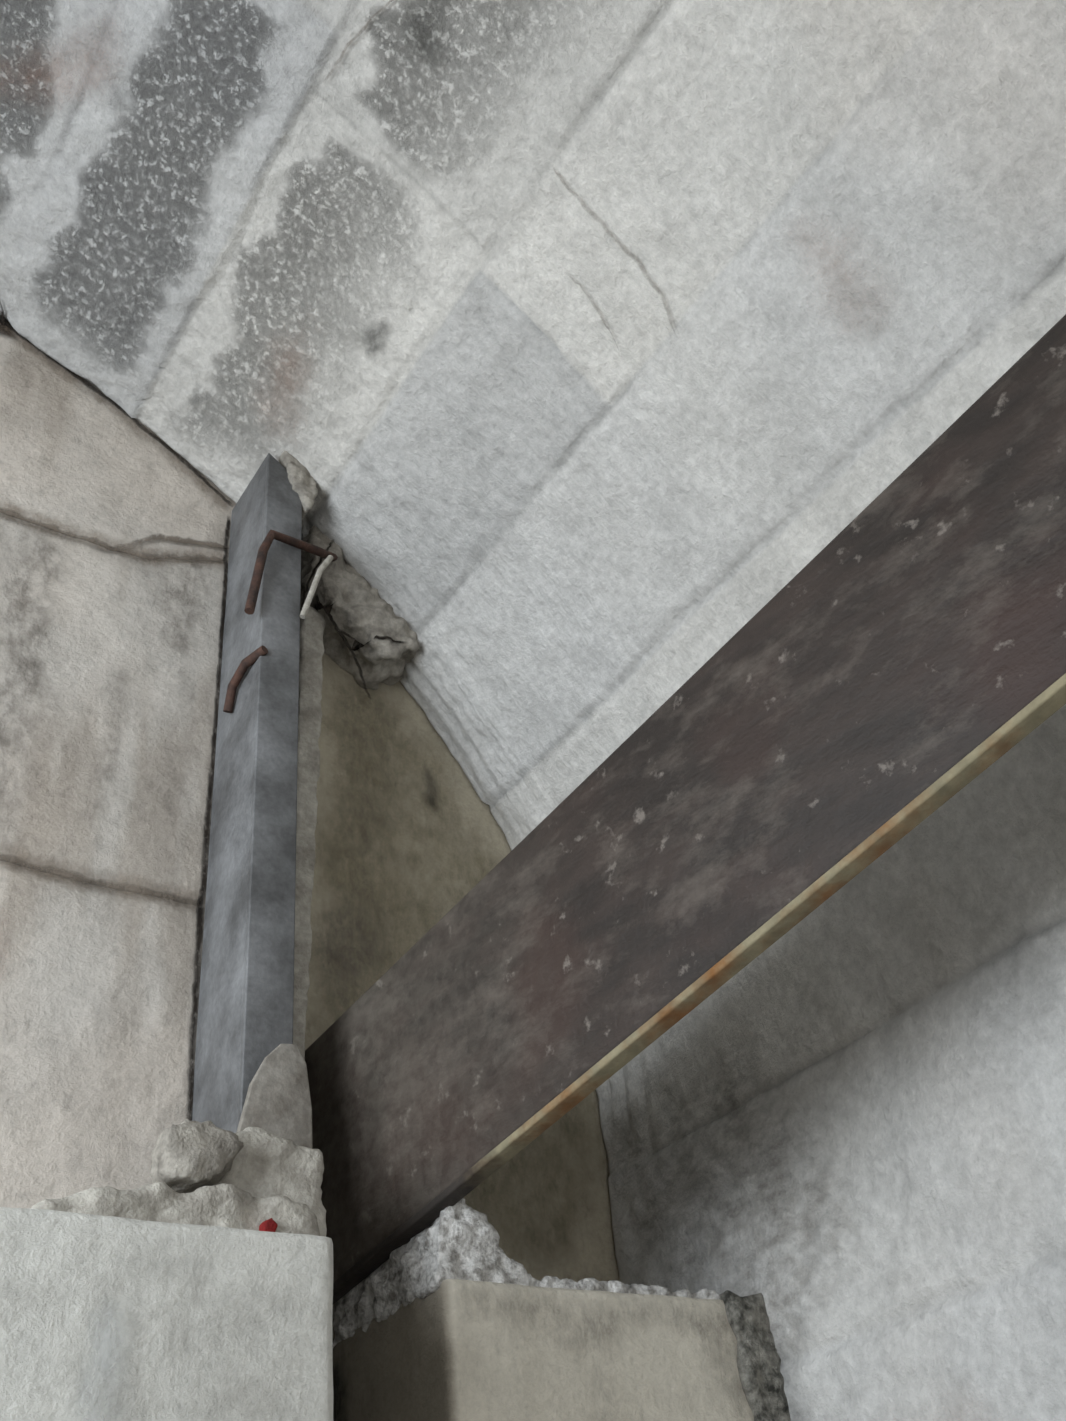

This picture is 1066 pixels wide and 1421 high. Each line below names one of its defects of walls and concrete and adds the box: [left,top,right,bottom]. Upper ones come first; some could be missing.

crack [0,302,232,1121]